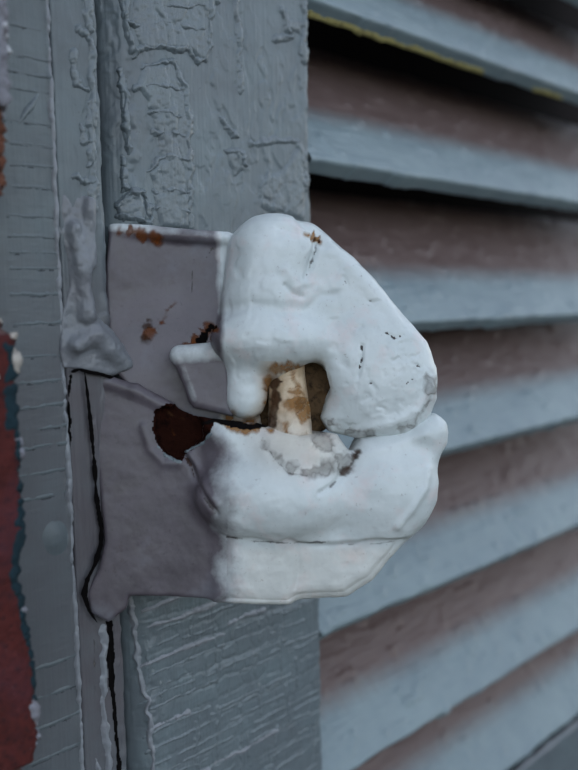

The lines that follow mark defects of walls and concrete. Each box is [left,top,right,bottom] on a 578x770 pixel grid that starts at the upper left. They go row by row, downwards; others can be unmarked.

peeling [0,0,13,196]
crack [7,52,52,94]
crack [6,213,58,271]
rust [118,225,162,246]
rust [142,319,163,341]
rust [183,323,218,345]
rust [217,361,330,435]
crack [16,354,320,770]